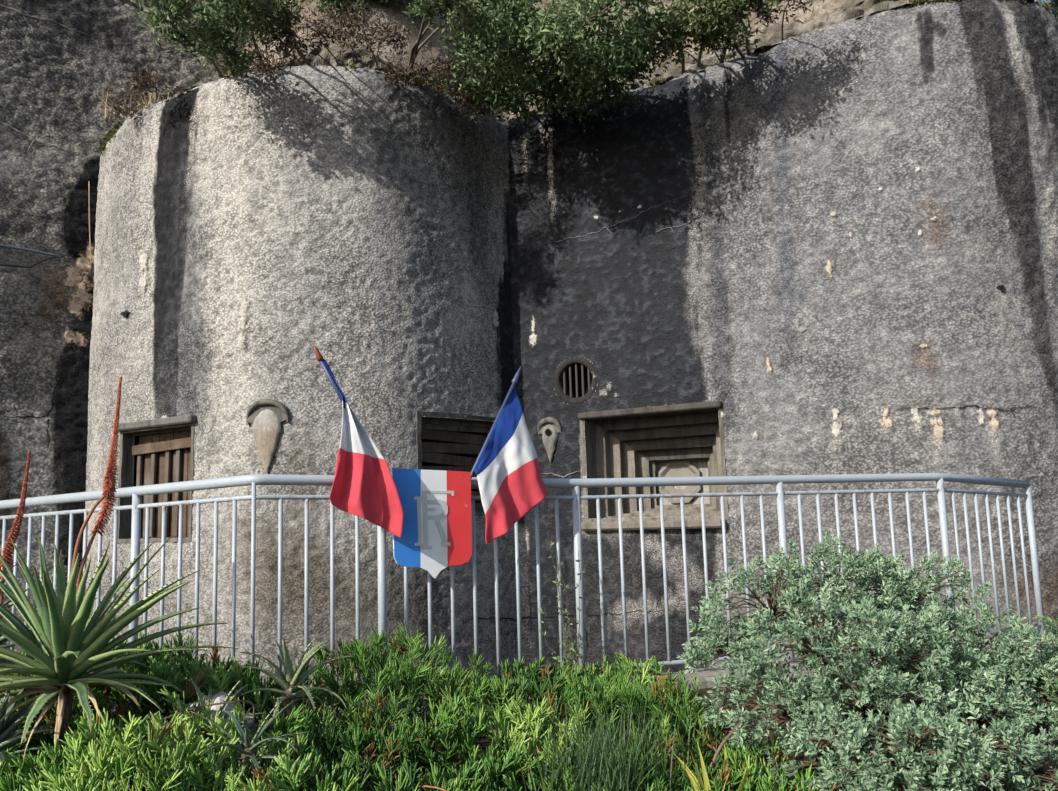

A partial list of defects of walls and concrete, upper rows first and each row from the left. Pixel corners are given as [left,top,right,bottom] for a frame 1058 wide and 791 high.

leakage [62,156,101,265]
leakage [153,87,205,418]
leakage [958,0,1058,404]
crack [1,374,57,447]
leakage [52,278,94,587]
leakage [496,76,731,682]
spalling [831,409,842,446]
spalling [878,406,892,432]
spalling [911,408,944,448]
spalling [977,408,999,436]